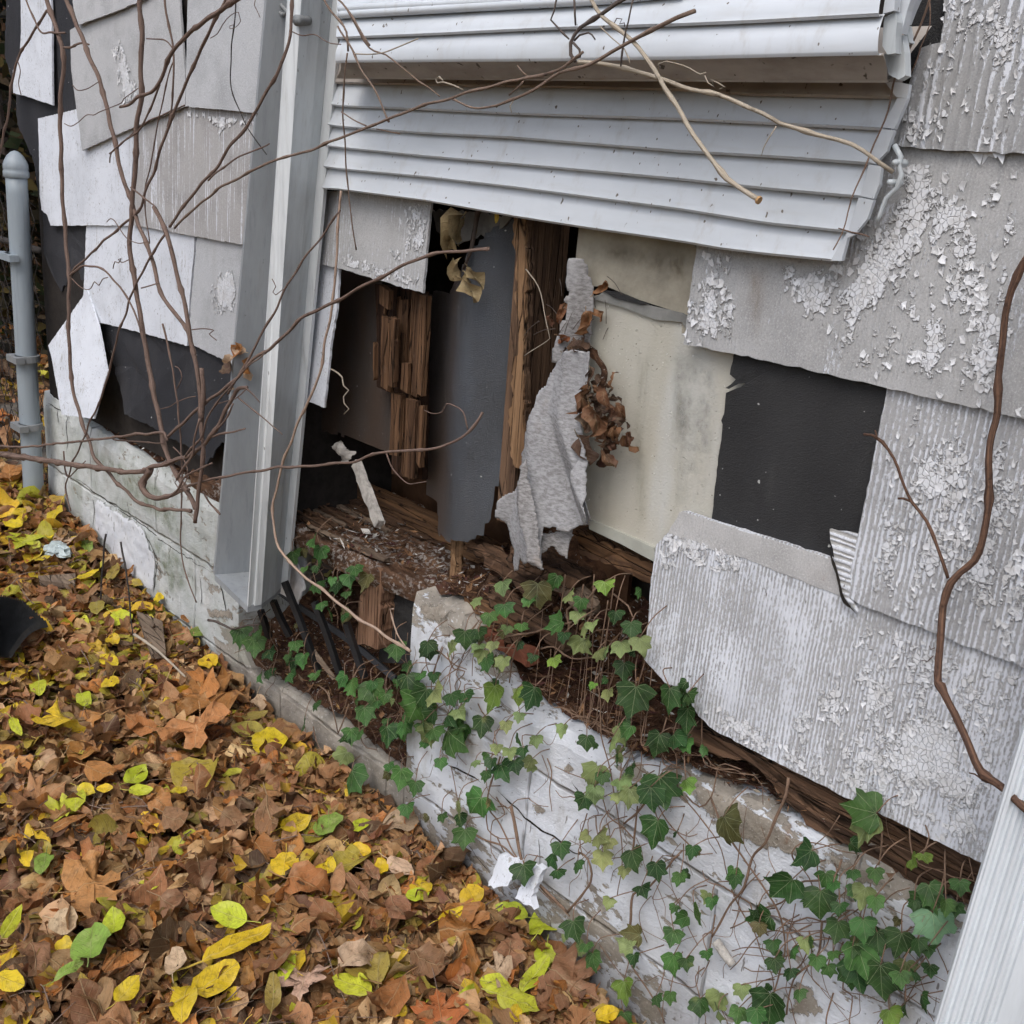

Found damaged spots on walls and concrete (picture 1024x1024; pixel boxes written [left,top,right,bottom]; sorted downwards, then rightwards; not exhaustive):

peeling [112,40,138,105]
peeling [900,0,1024,146]
peeling [210,269,236,315]
peeling [342,203,428,285]
peeling [683,251,736,346]
peeling [781,126,1017,408]
peeling [657,534,742,573]
peeling [873,405,1024,662]
peeling [698,626,1019,856]
crack [449,765,580,855]
spalling [693,783,890,887]
spalling [789,982,822,1017]